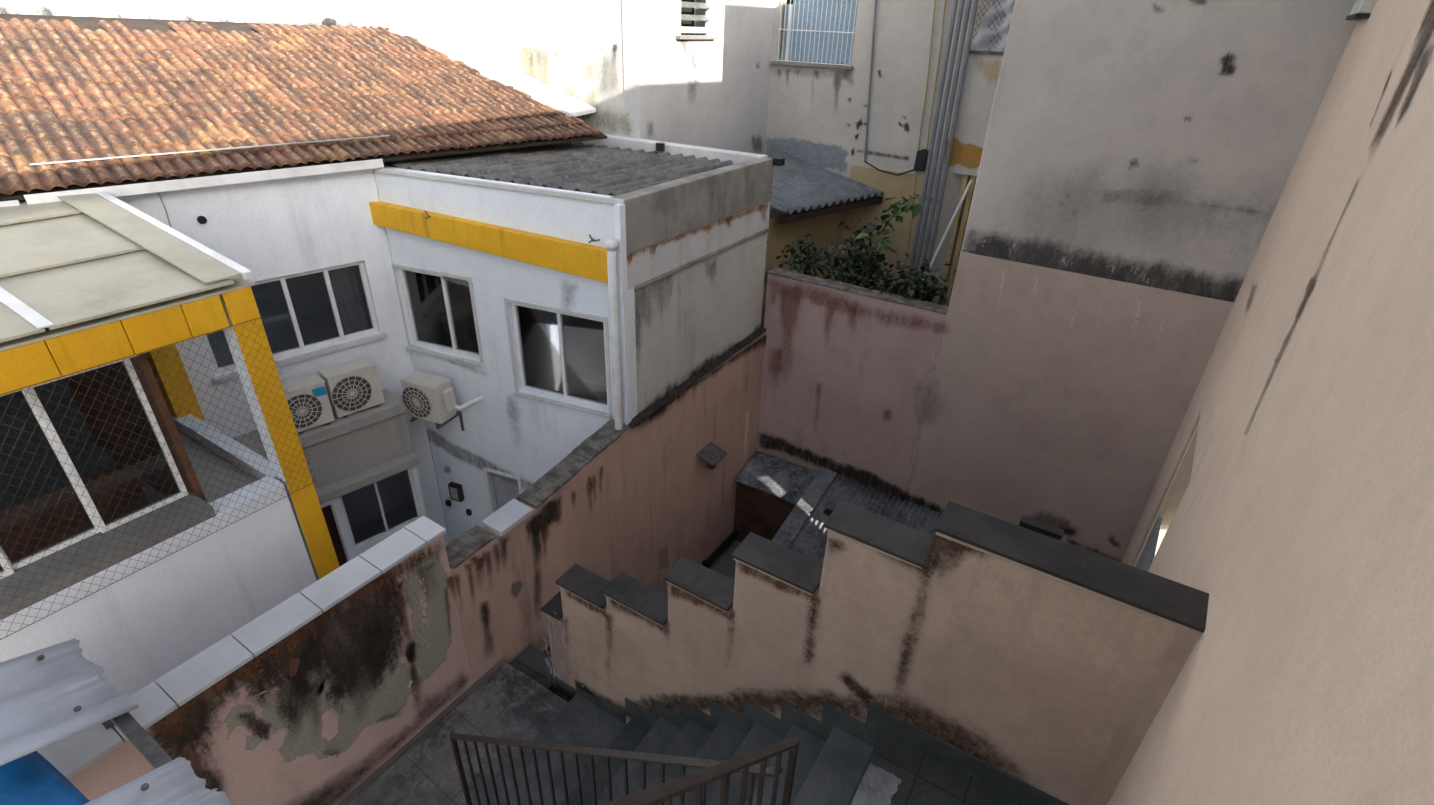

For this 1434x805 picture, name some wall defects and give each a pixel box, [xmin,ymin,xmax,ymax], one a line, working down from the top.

corrosion [627,204,767,262]
damp [642,274,942,427]
damp [966,236,1243,394]
peeling [223,550,451,763]
damp [526,467,603,596]
damp [567,591,669,642]
damp [669,584,734,631]
damp [535,612,1019,774]
damp [738,562,819,662]
damp [900,534,984,577]